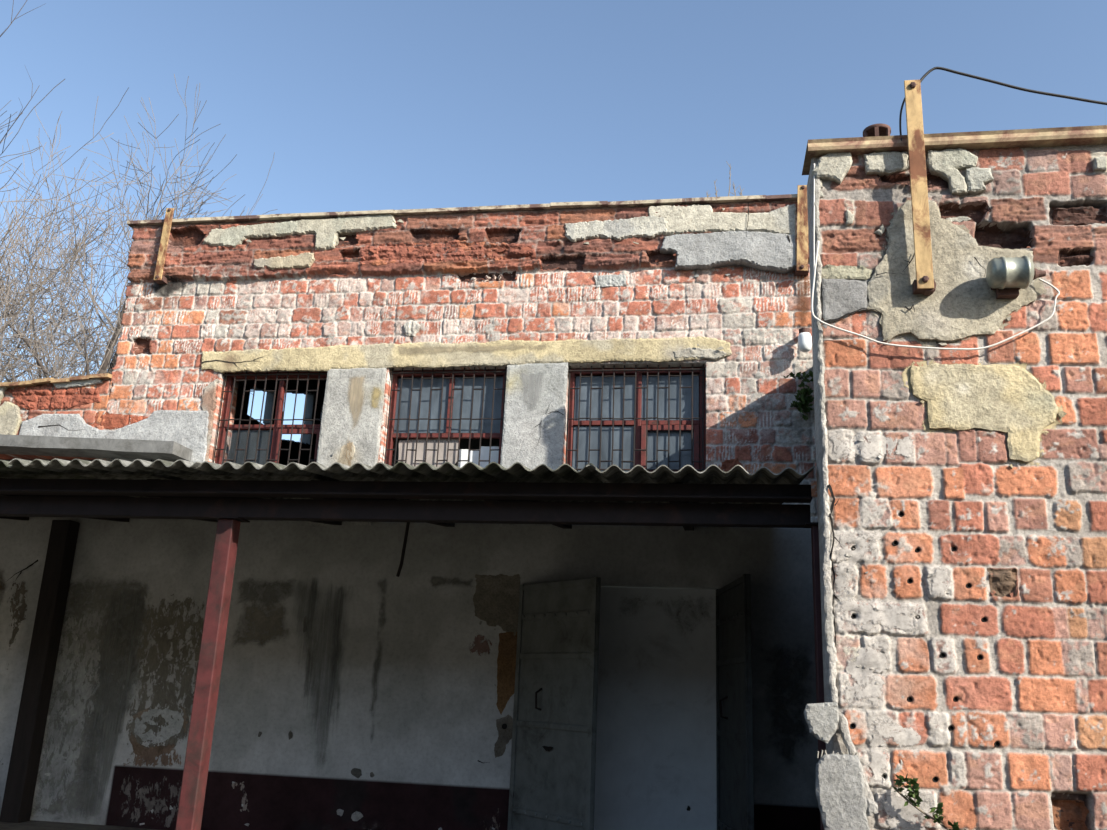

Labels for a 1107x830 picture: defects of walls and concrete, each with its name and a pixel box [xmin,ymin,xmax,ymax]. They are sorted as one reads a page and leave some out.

spalling [1052,206,1107,226]
spalling [338,219,589,283]
spalling [633,242,677,264]
spalling [1058,246,1094,266]
crack [827,484,840,643]
flaking render [471,574,520,636]
damp [236,580,344,732]
flaking render [36,581,205,828]
flaking render [494,715,513,758]
peeling [804,702,878,817]
spalling [1051,800,1089,830]